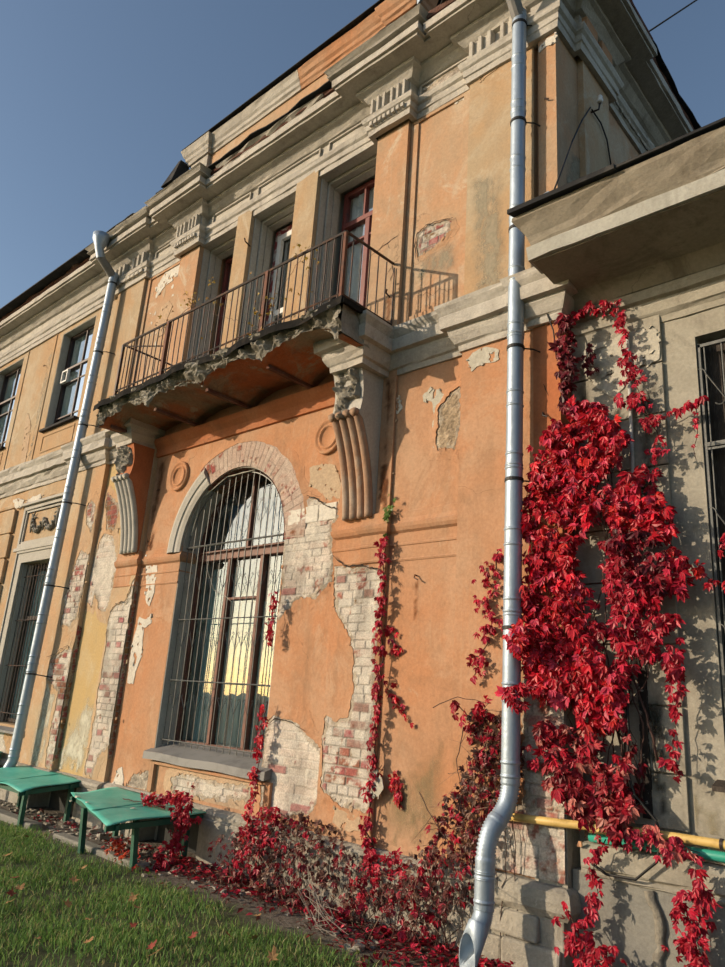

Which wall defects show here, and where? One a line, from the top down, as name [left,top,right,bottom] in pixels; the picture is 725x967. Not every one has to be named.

flaking render [413,213,459,265]
spalling [96,303,370,434]
flaking render [423,376,461,464]
peeling [466,347,499,371]
flaking render [41,485,157,792]
flaking render [163,432,385,832]